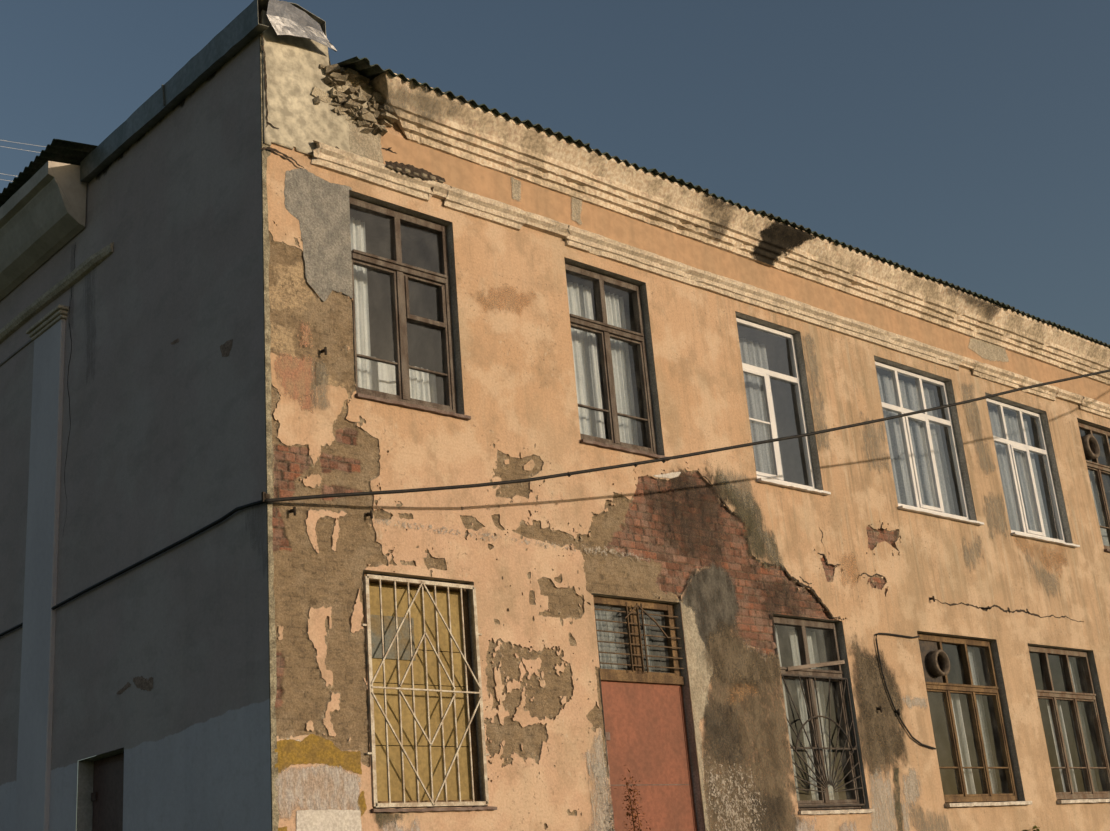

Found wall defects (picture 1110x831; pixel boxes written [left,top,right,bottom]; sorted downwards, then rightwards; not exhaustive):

spalling [310,64,399,136]
leakage [752,221,815,266]
flaking render [269,232,446,767]
flaking render [460,444,844,662]
flaking render [863,575,887,591]
flaking render [866,523,901,556]
crack [935,599,1084,622]
peeling [484,609,609,782]
leakage [701,623,800,831]
leakage [851,643,949,831]
peeling [703,757,767,831]